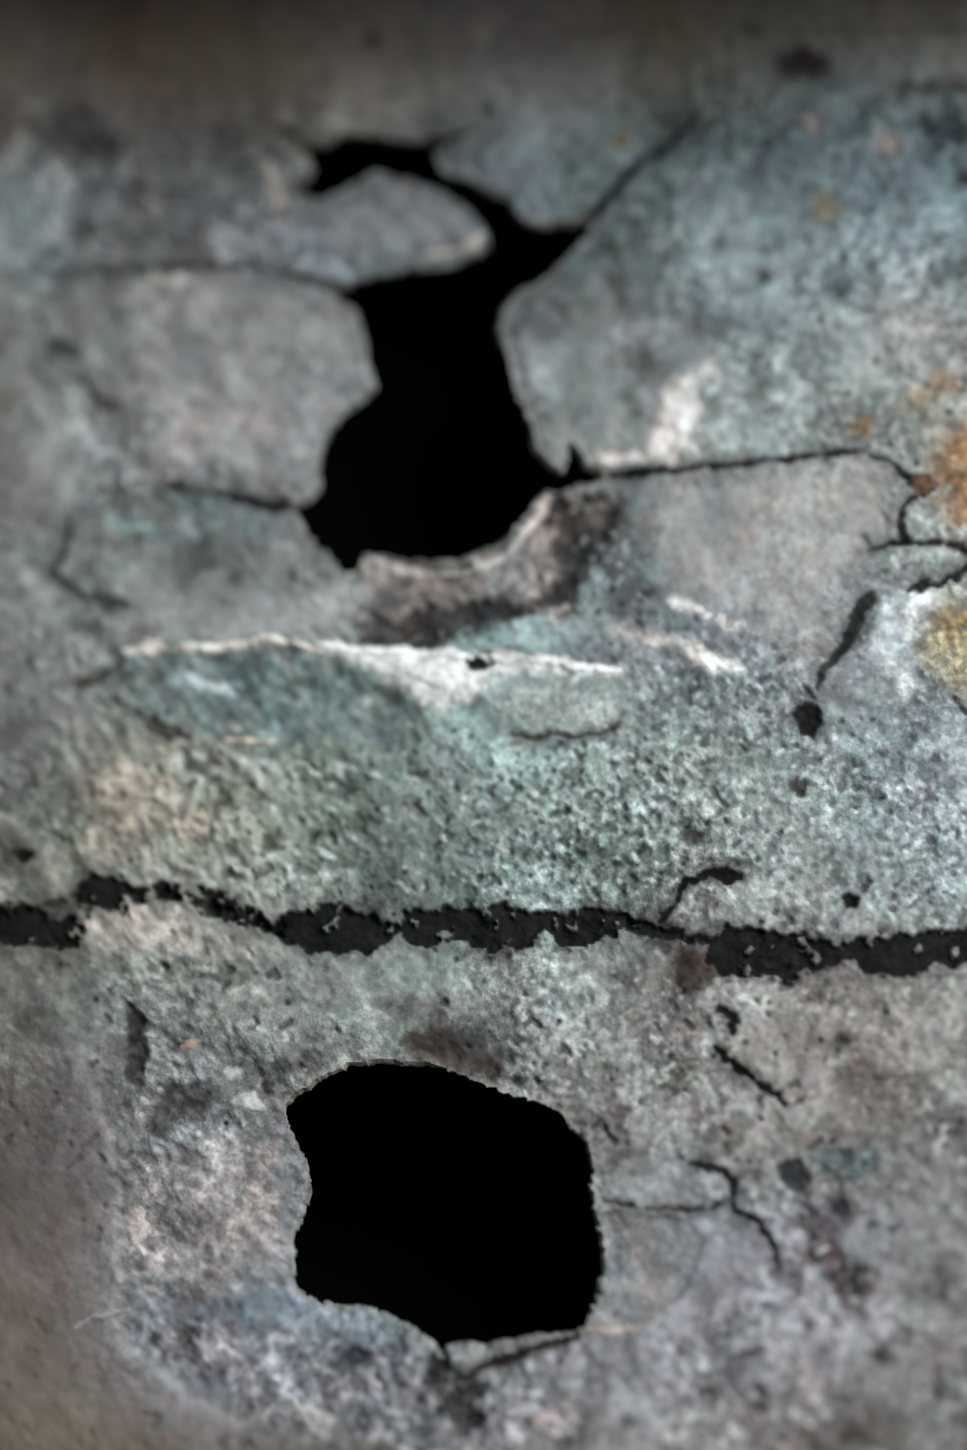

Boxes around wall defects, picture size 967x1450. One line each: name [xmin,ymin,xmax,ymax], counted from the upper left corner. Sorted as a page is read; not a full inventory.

crack [584,111,700,222]
spalling [71,121,622,649]
crack [155,484,292,515]
corrosion [935,430,967,523]
crack [608,448,967,690]
peeling [110,634,420,749]
spalling [465,651,494,671]
corrosion [932,605,967,682]
crack [12,849,33,863]
crack [0,868,967,1107]
spalling [124,1005,148,1089]
spalling [74,1058,706,1450]